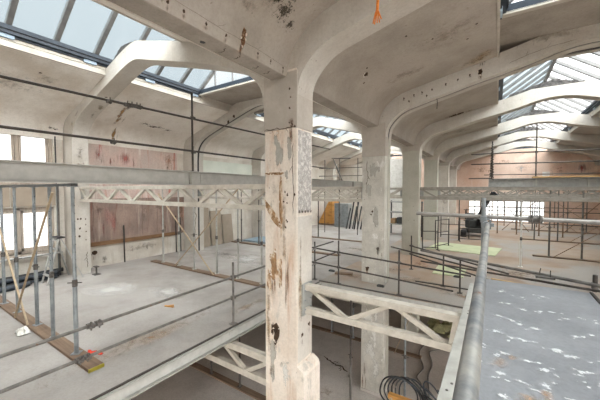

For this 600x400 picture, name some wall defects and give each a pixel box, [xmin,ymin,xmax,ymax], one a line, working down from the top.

damp [273,0,297,30]
peeling [272,132,292,183]
spalling [271,323,280,345]